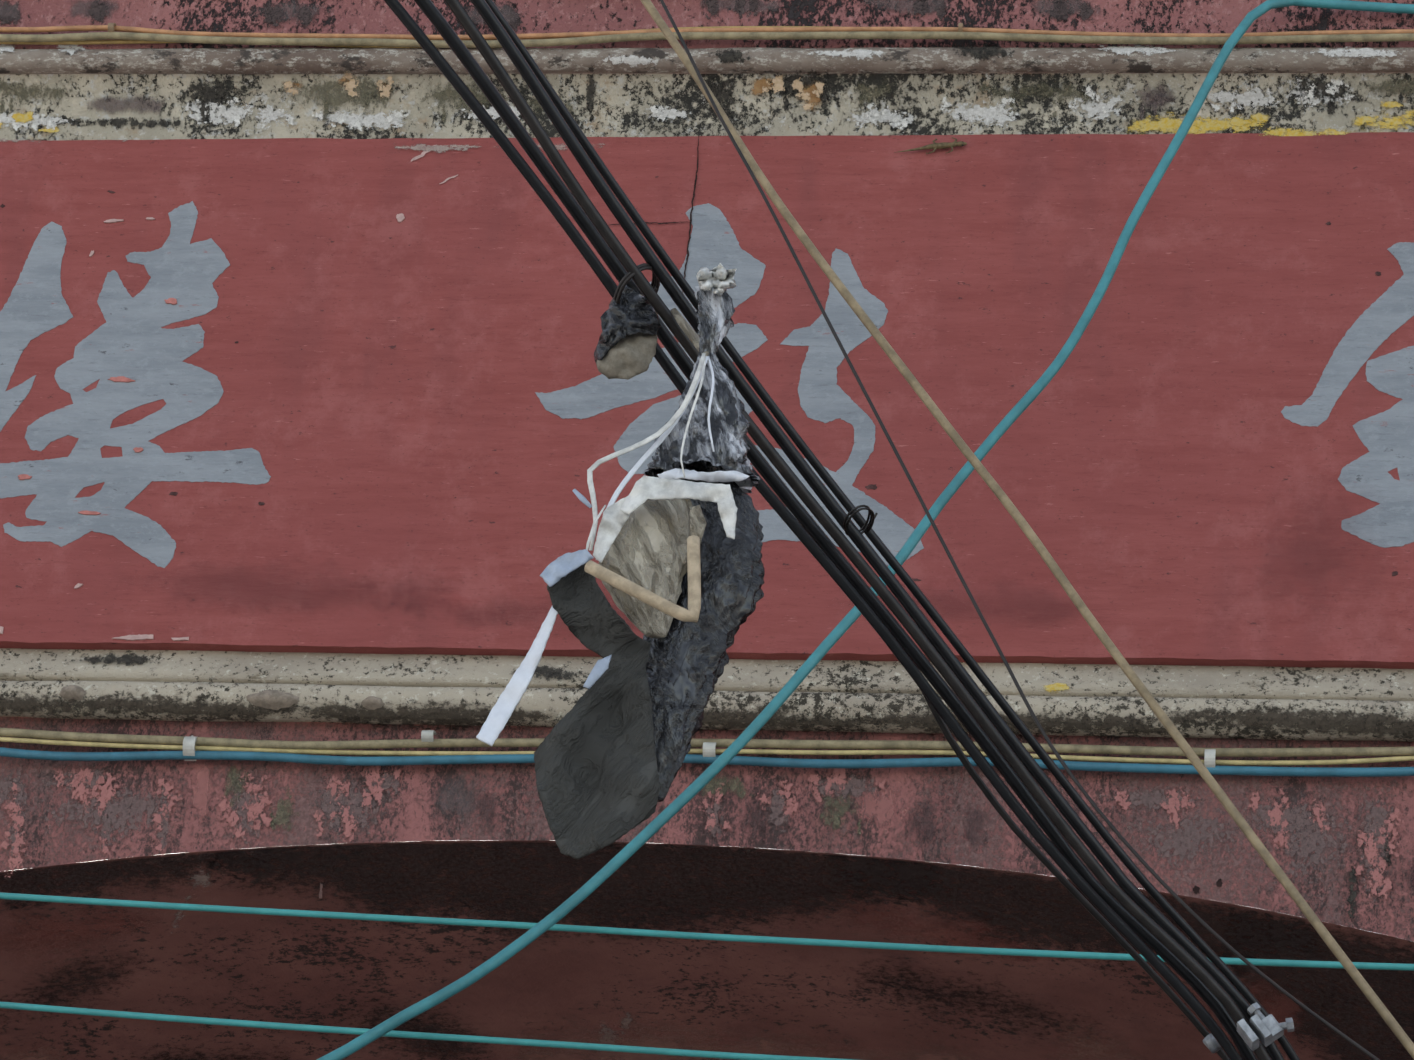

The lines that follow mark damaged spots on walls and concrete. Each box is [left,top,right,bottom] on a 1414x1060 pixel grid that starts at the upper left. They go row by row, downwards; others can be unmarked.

leakage [0,73,247,130]
leakage [561,54,666,122]
leakage [769,49,895,114]
leakage [1310,46,1402,58]
leakage [0,691,491,730]
leakage [1000,705,1414,741]
peeling [0,761,183,877]
peeling [218,768,280,847]
peeling [308,766,406,843]
peeling [756,755,885,836]
peeling [1243,788,1331,852]
peeling [1353,788,1406,910]